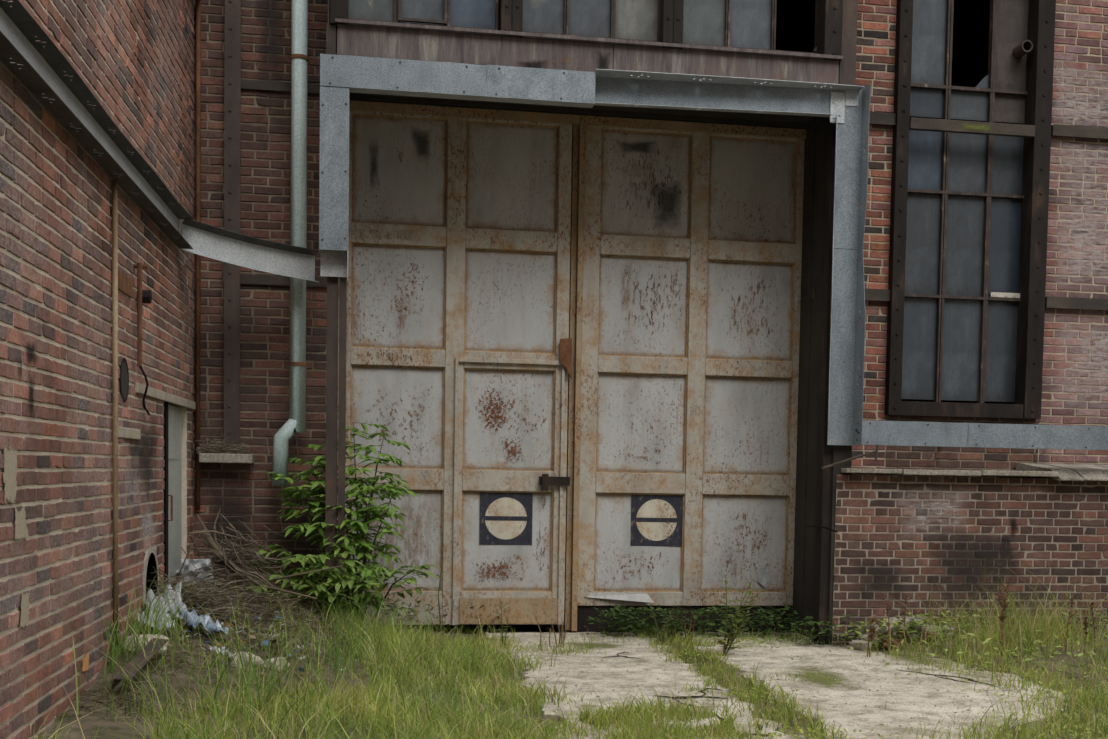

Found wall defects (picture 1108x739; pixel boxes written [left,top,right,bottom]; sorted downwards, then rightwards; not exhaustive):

rust [617,269,682,344]
rust [475,388,546,463]
rust [473,523,549,582]